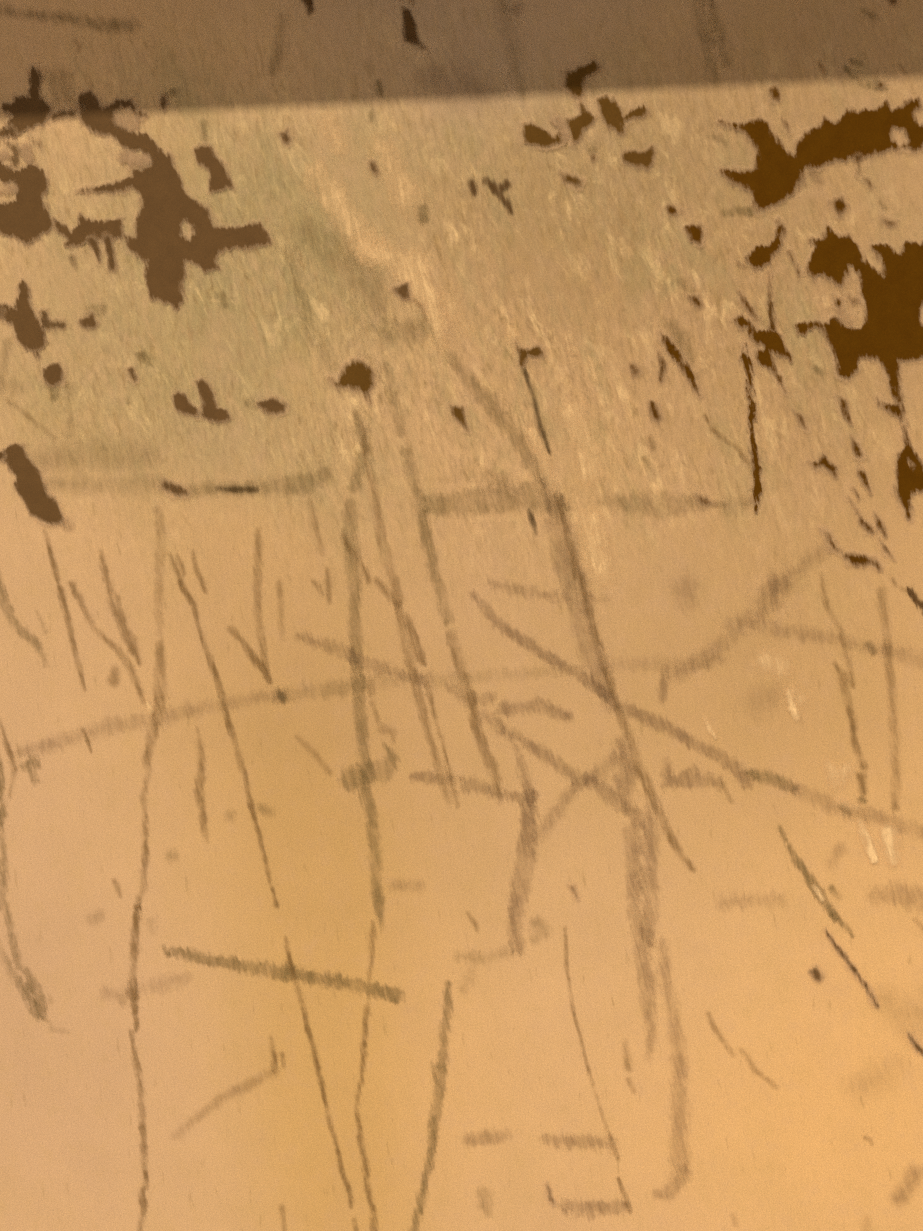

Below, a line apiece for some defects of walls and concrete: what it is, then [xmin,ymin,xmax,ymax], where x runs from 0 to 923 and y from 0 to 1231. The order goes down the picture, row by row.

peeling [522,60,651,148]
peeling [0,66,271,310]
peeling [621,144,655,169]
peeling [718,82,923,520]
peeling [172,378,230,424]
peeling [329,359,375,404]
peeling [0,442,63,525]
peeling [838,395,892,557]
peeling [907,587,923,608]